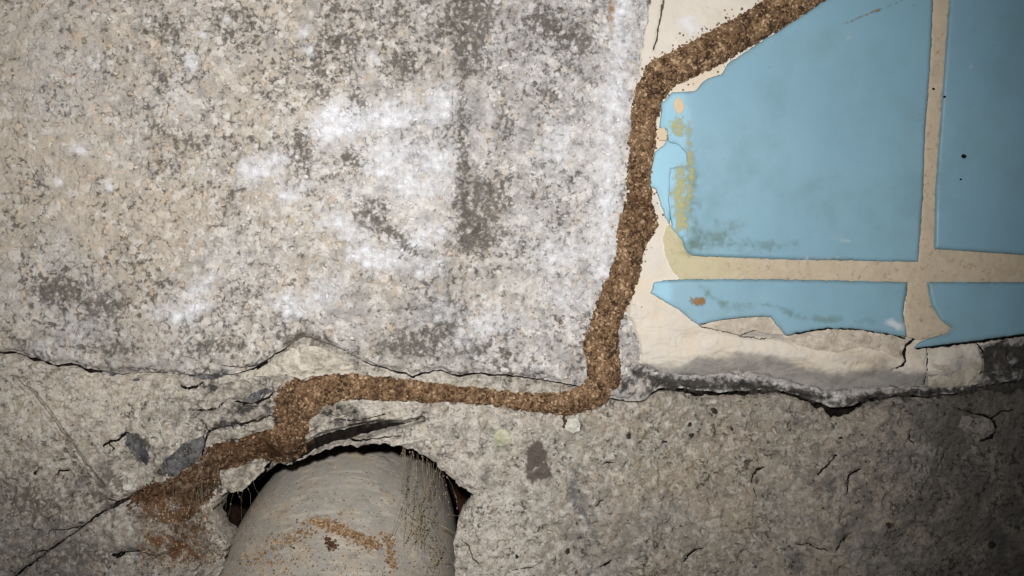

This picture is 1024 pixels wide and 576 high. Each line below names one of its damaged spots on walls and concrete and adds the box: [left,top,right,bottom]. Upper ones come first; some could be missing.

leakage [146,113,206,175]
leakage [240,0,512,276]
leakage [521,0,632,279]
crack [0,351,142,375]
leakage [172,269,214,324]
leakage [275,284,339,317]
crack [180,336,577,456]
leakage [369,291,511,359]
peeling [700,316,905,359]
crack [635,317,1024,466]
peeling [927,345,984,388]
crack [15,489,149,576]